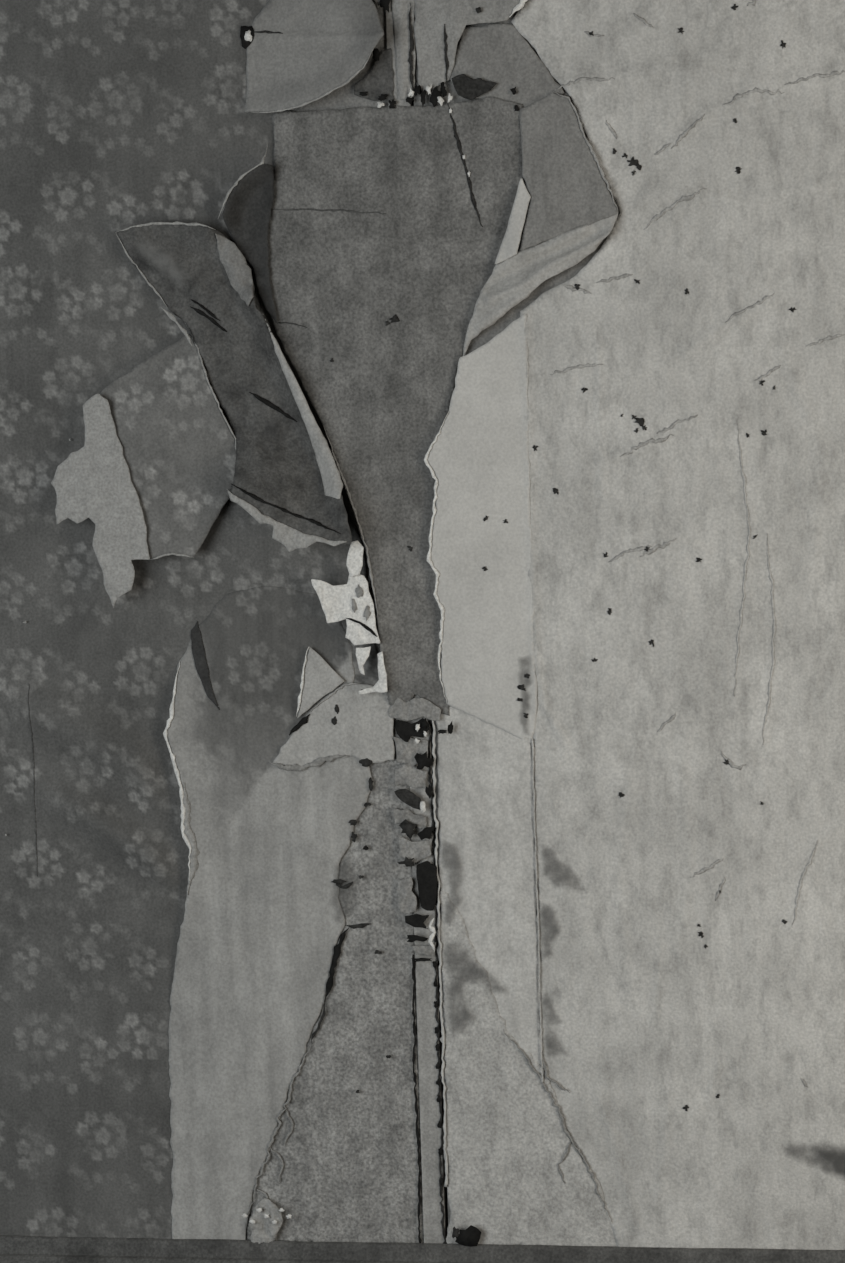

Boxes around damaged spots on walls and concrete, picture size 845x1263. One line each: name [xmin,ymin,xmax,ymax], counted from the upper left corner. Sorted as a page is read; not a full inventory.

spalling [354,48,519,111]
flaking render [242,718,617,1247]
crack [503,1029,612,1221]
damp [814,1147,845,1175]